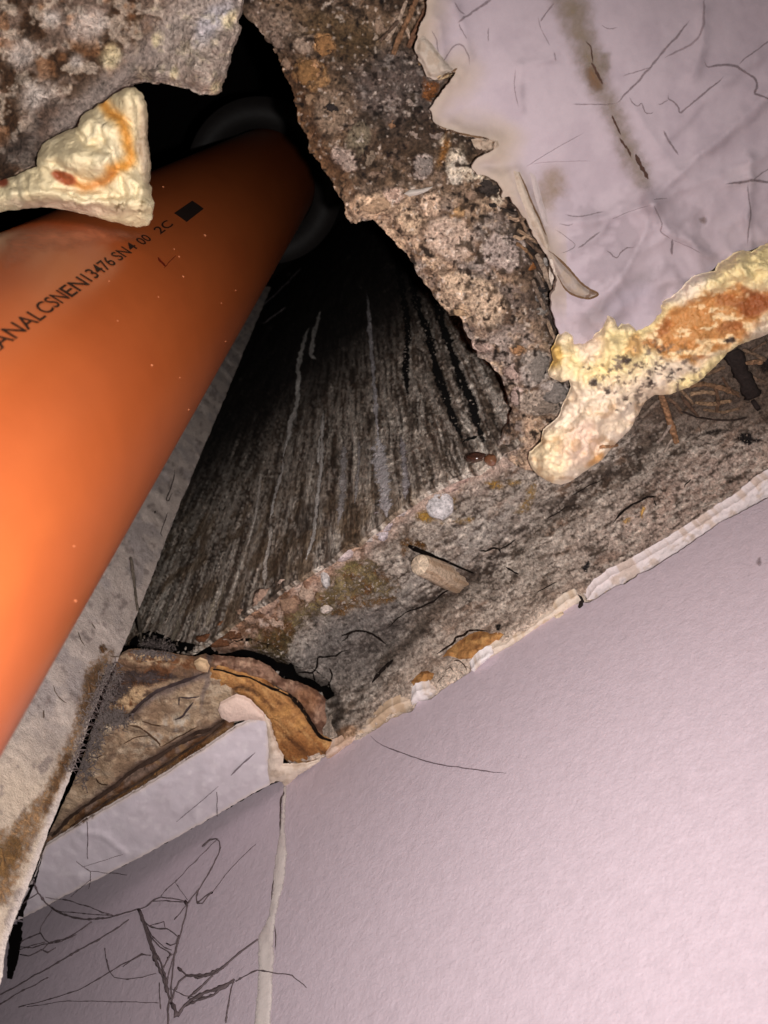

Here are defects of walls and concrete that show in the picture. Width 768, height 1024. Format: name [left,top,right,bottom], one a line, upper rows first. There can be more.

damp [563,0,615,116]
crack [586,6,768,179]
efflorescence [247,312,321,585]
efflorescence [306,411,324,559]
damp [336,296,411,525]
spalling [0,0,768,745]
crack [68,590,448,828]
crack [371,736,502,773]